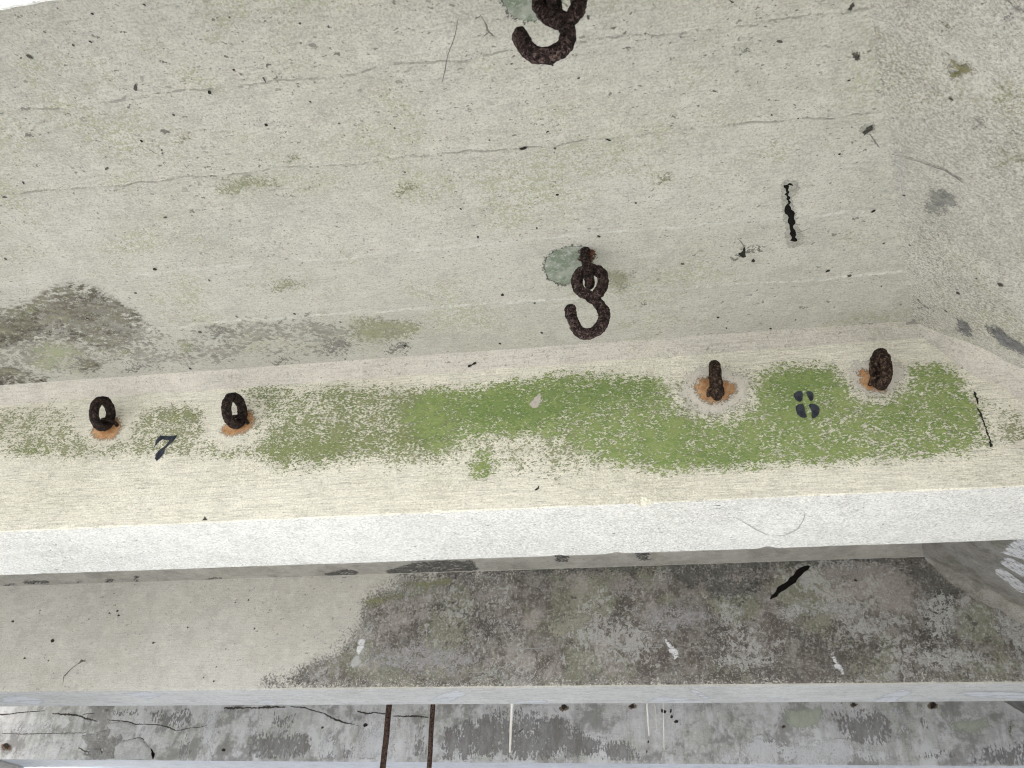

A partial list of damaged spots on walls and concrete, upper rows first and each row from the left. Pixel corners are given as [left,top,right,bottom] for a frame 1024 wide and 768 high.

crack [780,180,810,248]
damp [0,284,411,385]
damp [679,366,750,415]
rust [691,376,739,405]
rust [856,368,887,392]
rust [91,418,123,440]
rust [221,409,256,436]
crack [974,391,993,447]
crack [770,565,810,599]
damp [995,539,1024,594]
damp [249,552,1024,765]
crack [0,706,428,735]